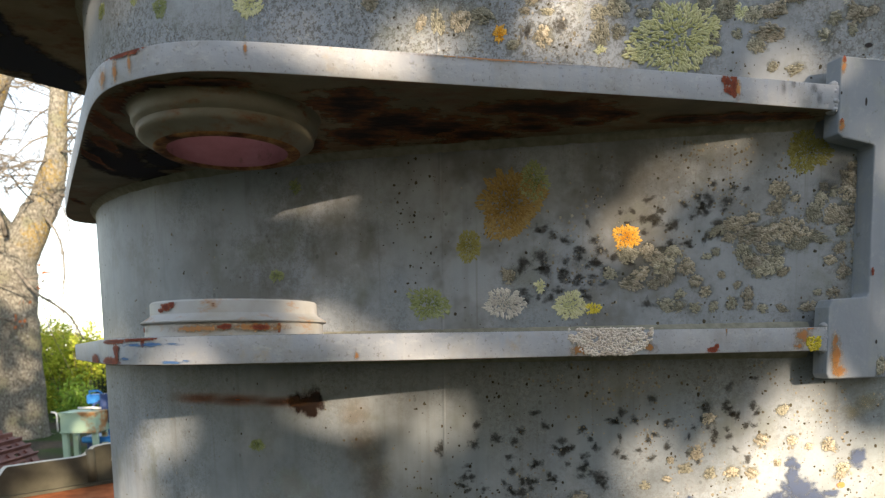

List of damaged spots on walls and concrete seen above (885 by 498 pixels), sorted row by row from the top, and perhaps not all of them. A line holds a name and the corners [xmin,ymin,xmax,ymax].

corrosion [721,76,741,98]
corrosion [80,47,253,171]
corrosion [298,86,639,154]
corrosion [649,111,817,124]
corrosion [158,302,174,313]
corrosion [178,323,282,333]
corrosion [92,328,157,366]
corrosion [832,334,846,377]
corrosion [183,387,324,417]